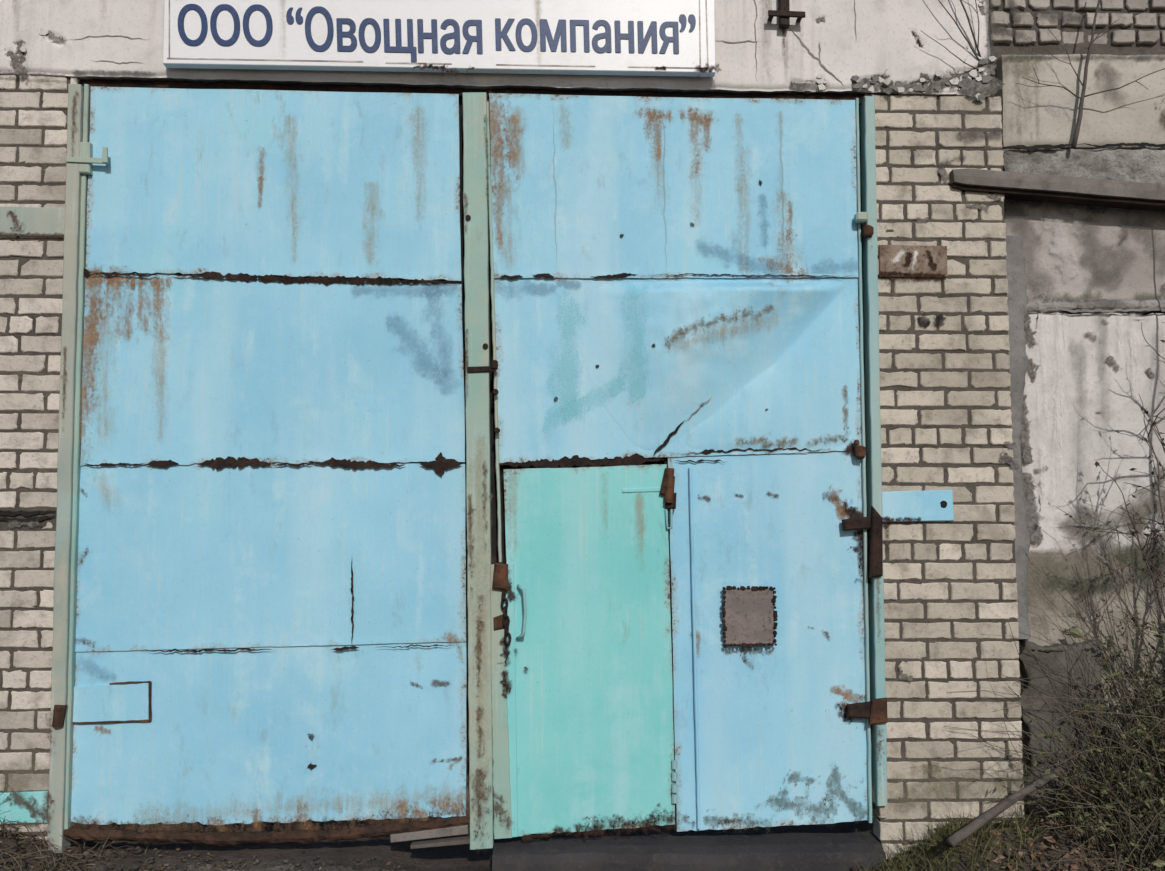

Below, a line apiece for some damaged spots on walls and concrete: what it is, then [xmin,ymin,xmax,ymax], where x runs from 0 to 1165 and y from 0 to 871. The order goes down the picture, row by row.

crack [794,33,888,85]
spalling [851,56,1005,100]
corrosion [647,110,712,158]
damp [1045,208,1119,283]
corrosion [467,464,490,572]
corrosion [500,639,517,698]
corrosion [70,587,511,850]
corrosion [522,805,695,841]